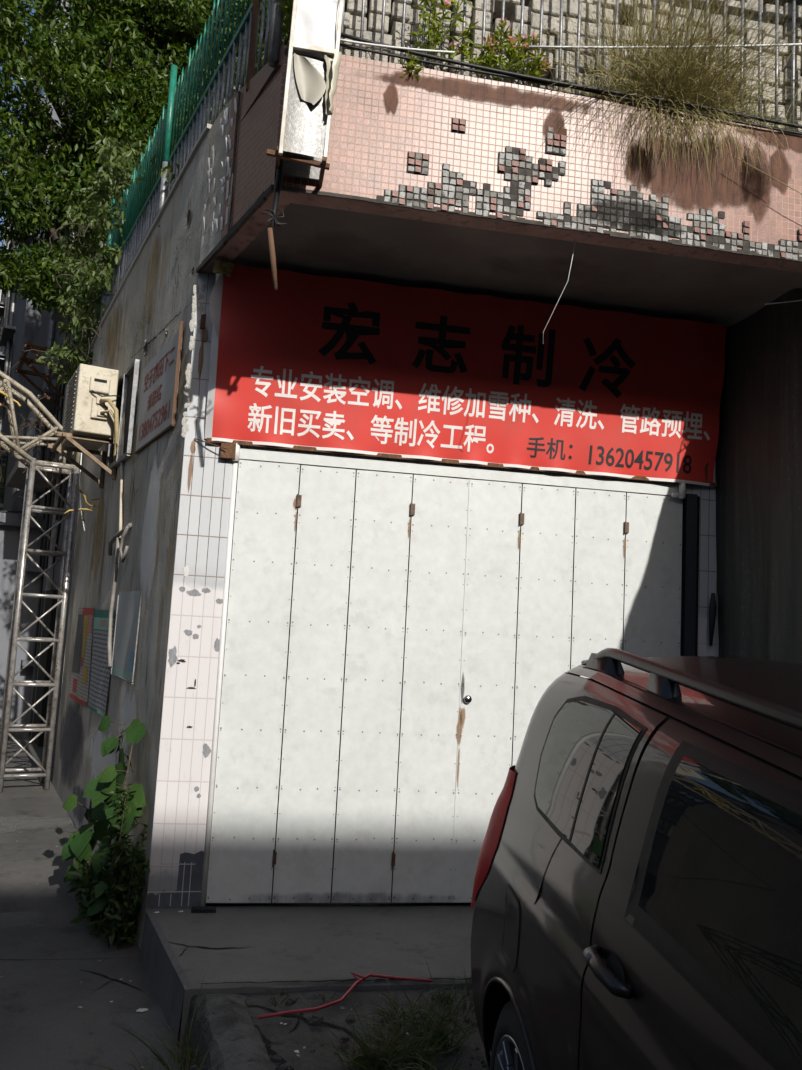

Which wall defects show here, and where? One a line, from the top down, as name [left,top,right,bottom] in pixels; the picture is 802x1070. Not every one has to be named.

spalling [451,117,466,133]
spalling [377,127,802,260]
peeling [179,564,223,604]
peeling [168,646,186,666]